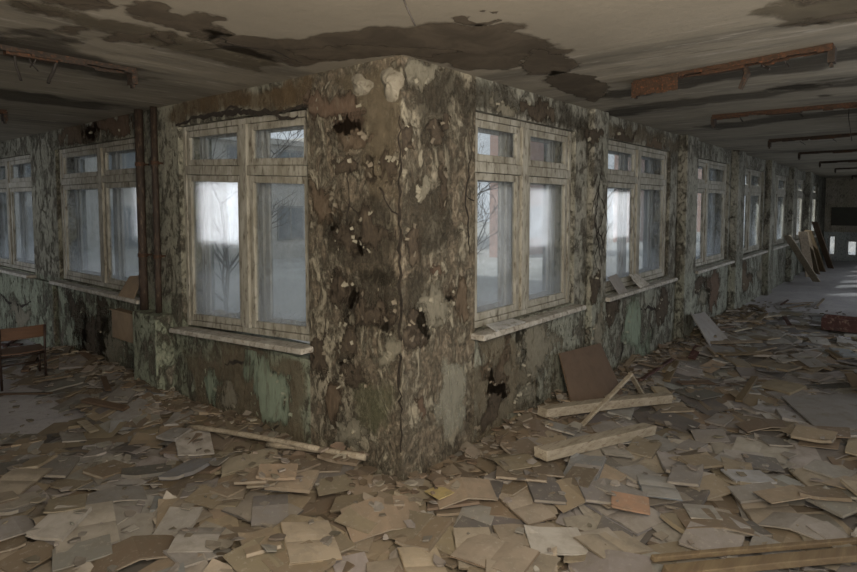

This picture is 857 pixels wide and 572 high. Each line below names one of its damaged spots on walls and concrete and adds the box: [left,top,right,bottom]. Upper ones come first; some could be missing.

peeling [404,57,439,95]
peeling [415,163,451,215]
peeling [695,269,721,315]
water stain [183,341,306,443]
peeling [463,321,564,436]